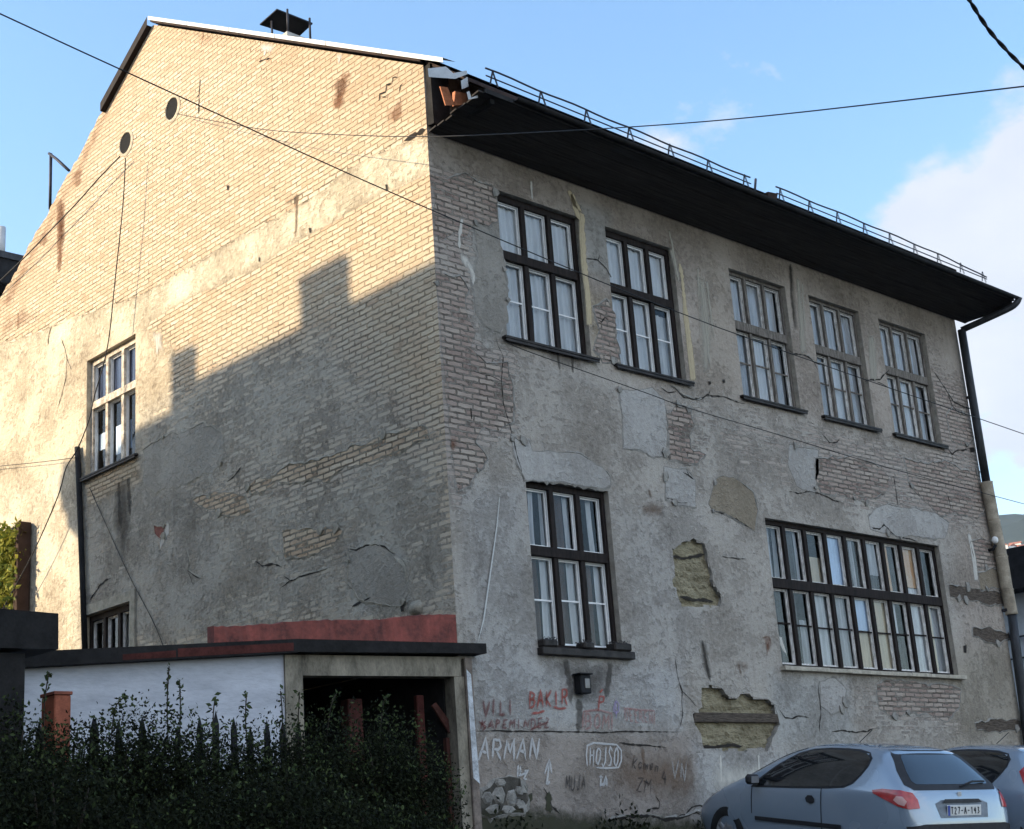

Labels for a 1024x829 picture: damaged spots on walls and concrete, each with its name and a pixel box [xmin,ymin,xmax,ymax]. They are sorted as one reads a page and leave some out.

spalling [430,173,612,493]
crack [662,386,745,404]
crack [934,372,970,415]
flaking render [617,386,759,532]
spalling [788,442,985,541]
crack [256,561,326,587]
crack [350,544,395,554]
spalling [666,531,727,616]
spalling [948,538,1004,607]
spalling [963,626,1010,653]
spalling [687,676,785,760]
spalling [974,718,1022,734]